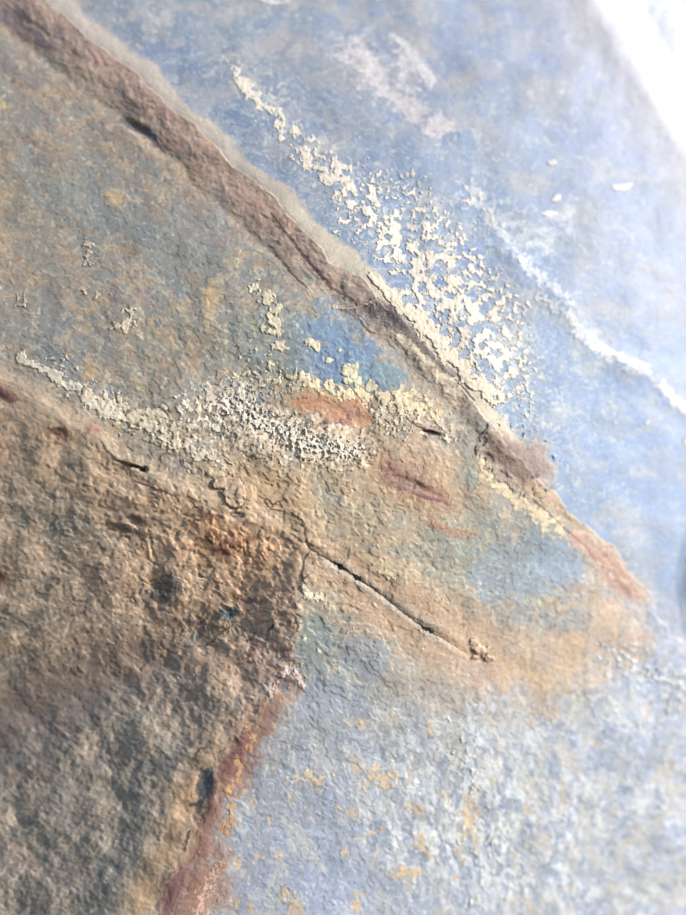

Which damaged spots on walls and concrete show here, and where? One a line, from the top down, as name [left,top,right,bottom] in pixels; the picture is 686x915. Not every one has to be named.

peeling [82,238,94,267]
peeling [224,59,542,418]
peeling [541,194,561,216]
peeling [16,278,461,519]
crack [101,440,213,544]
crack [206,623,275,646]
crack [228,495,467,653]
corrosion [145,675,338,915]